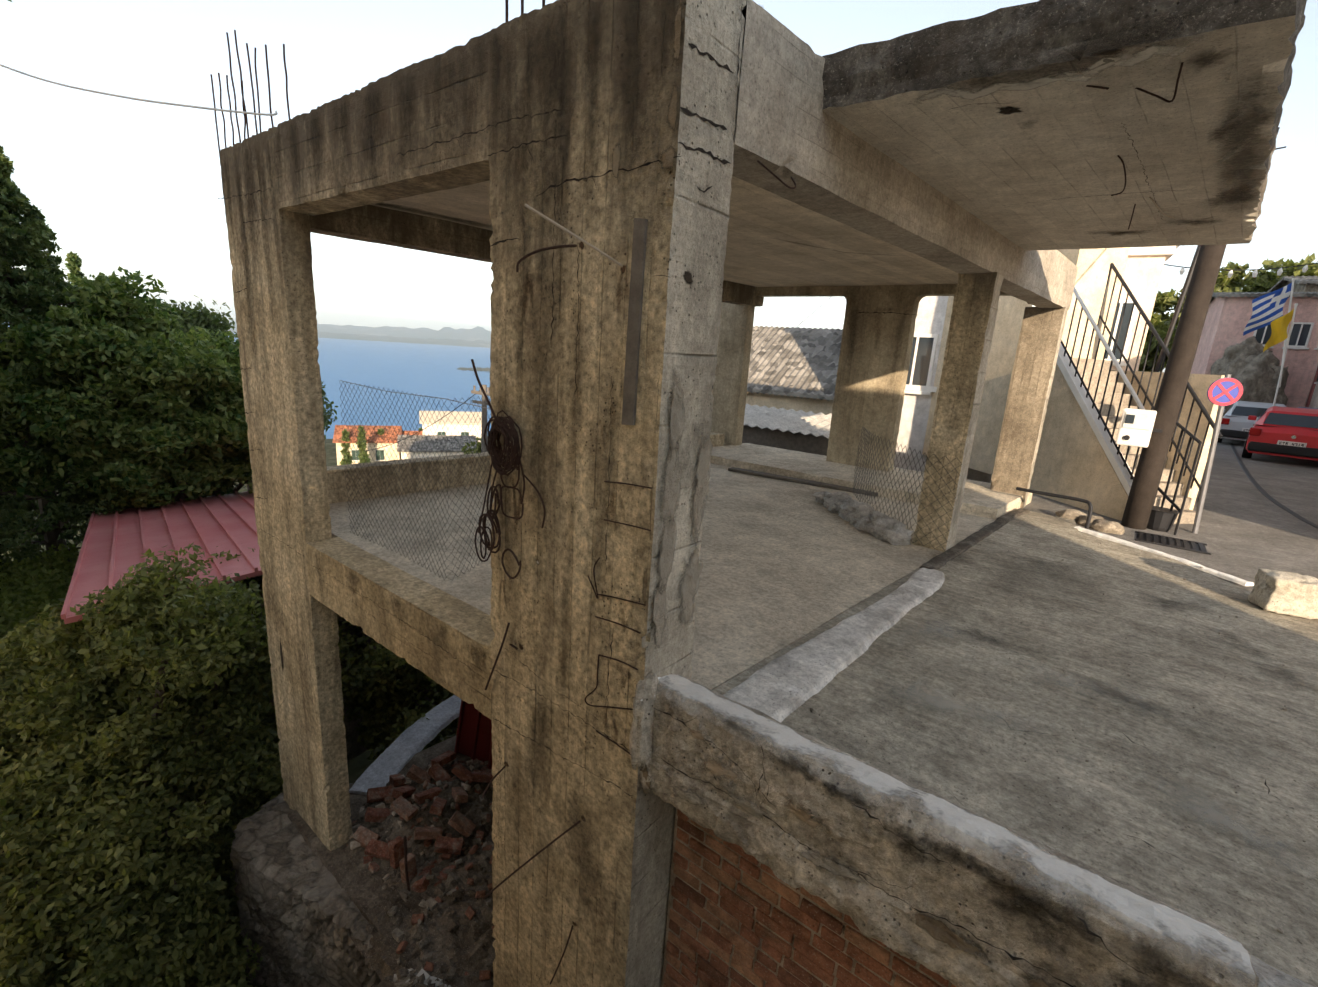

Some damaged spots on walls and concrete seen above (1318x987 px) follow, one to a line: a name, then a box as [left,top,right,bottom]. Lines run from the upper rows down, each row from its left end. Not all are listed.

crack [537,7,742,399]
damp [1212,77,1272,208]
damp [895,828,1099,942]